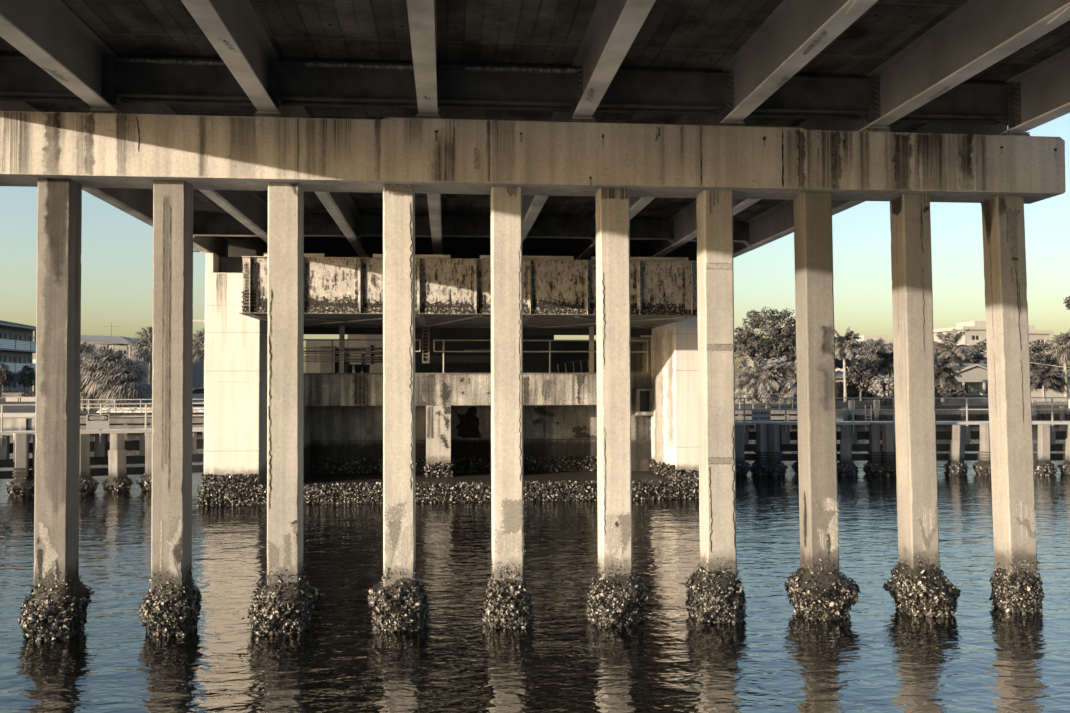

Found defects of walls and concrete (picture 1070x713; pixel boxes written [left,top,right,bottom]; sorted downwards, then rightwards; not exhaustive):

leakage [4,112,27,169]
leakage [44,112,62,160]
leakage [77,114,94,174]
leakage [797,130,868,189]
leakage [893,134,942,189]
leakage [958,133,985,176]
peeling [436,378,490,472]
peeling [36,520,60,581]
peeling [160,516,184,575]
peeling [268,520,298,568]
peeling [817,496,839,551]
peeling [916,507,938,552]